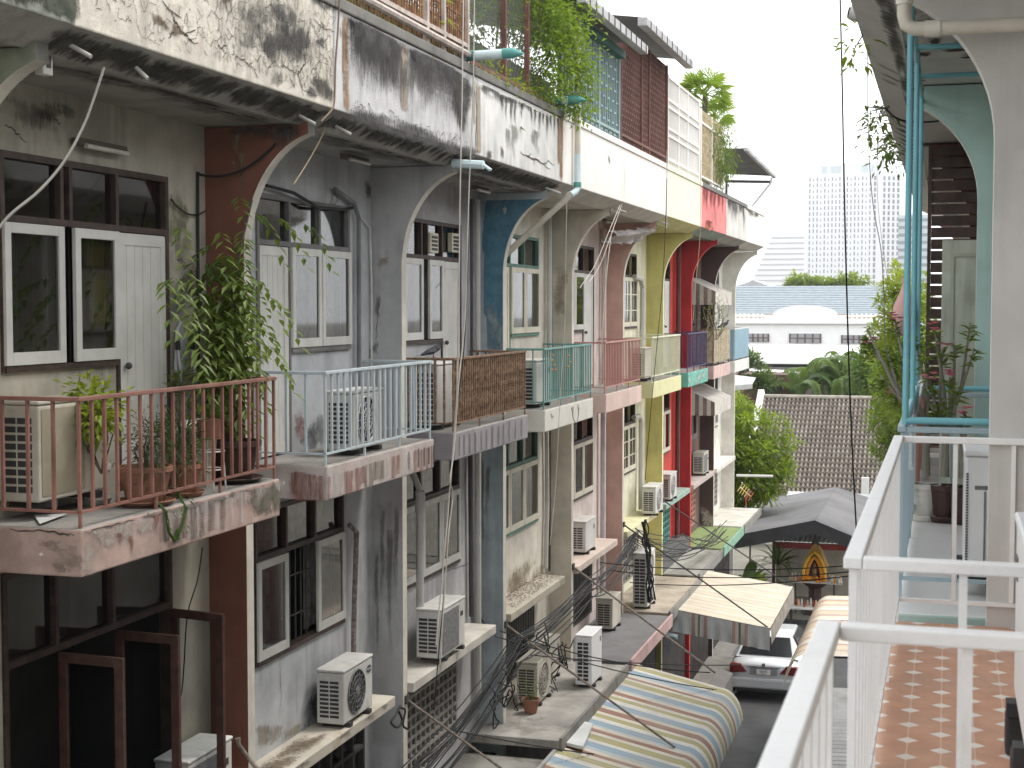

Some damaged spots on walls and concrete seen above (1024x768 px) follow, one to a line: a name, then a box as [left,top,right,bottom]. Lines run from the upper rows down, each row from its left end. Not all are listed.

crack [96,0,336,97]
leakage [10,0,559,191]
crack [520,151,553,169]
crack [10,508,184,536]